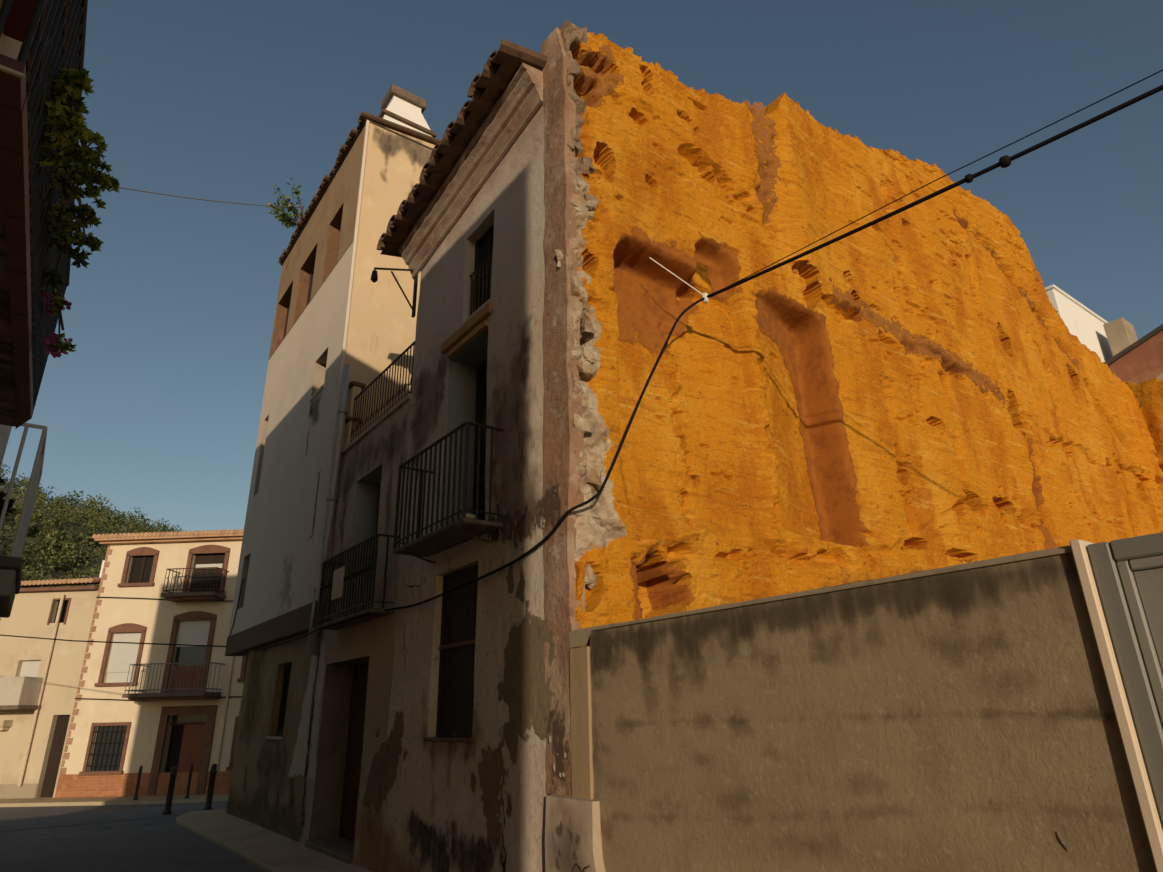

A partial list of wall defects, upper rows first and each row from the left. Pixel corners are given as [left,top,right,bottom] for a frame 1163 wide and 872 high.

peeling [450,483,569,844]
damp [592,572,999,668]
peeling [363,712,408,811]
damp [403,811,504,872]
crack [495,766,511,872]